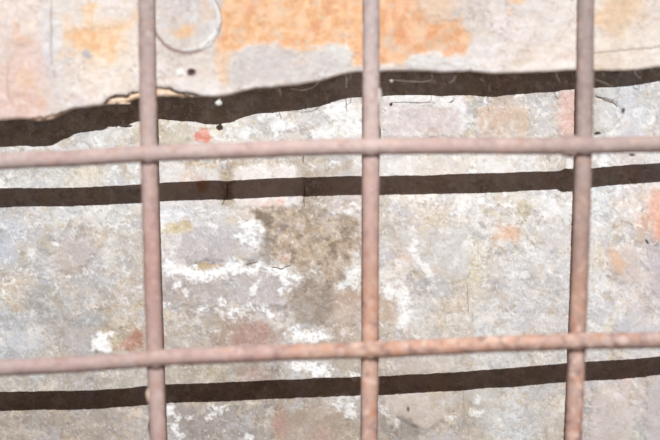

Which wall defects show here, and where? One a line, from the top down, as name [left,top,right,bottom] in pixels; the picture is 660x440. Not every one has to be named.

crack [47,0,55,66]
crack [104,91,138,105]
peeling [105,91,139,105]
crack [156,86,199,96]
peeling [156,88,201,98]
crack [595,95,618,107]
damp [160,188,362,344]
crack [246,261,291,270]
damp [288,360,361,383]